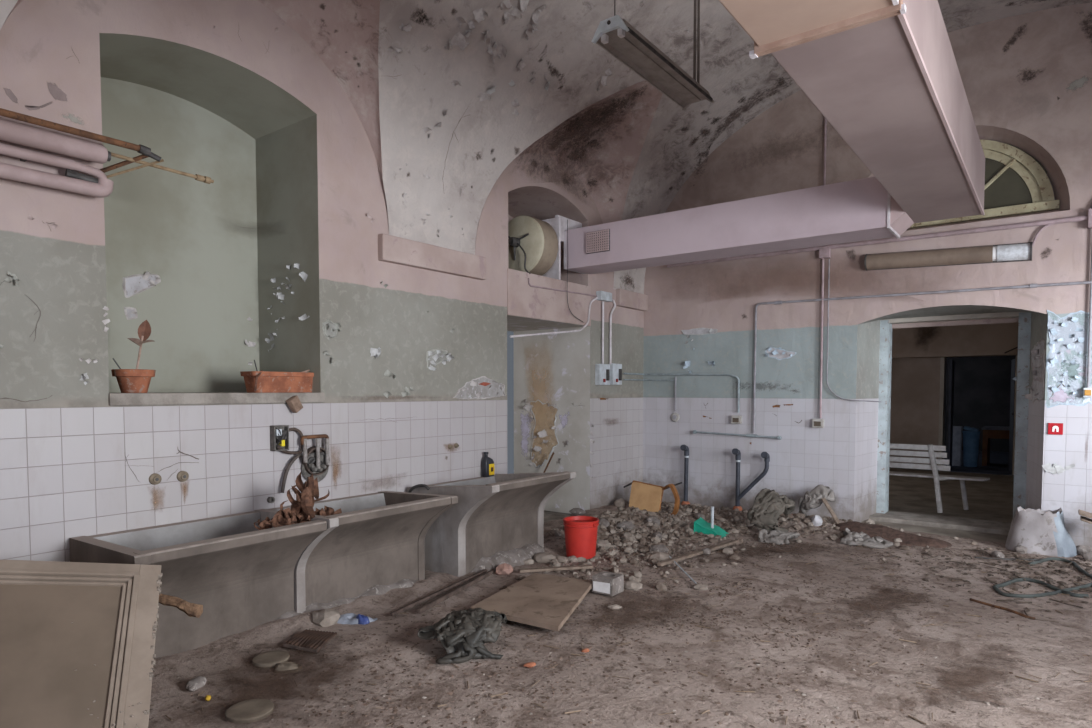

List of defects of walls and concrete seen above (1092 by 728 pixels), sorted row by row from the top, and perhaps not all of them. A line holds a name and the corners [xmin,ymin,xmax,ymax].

damp [532,92,642,194]
peeling [245,263,308,352]
peeling [426,349,454,371]
flaking render [453,376,506,400]
peeling [1013,310,1092,408]
peeling [523,399,559,468]